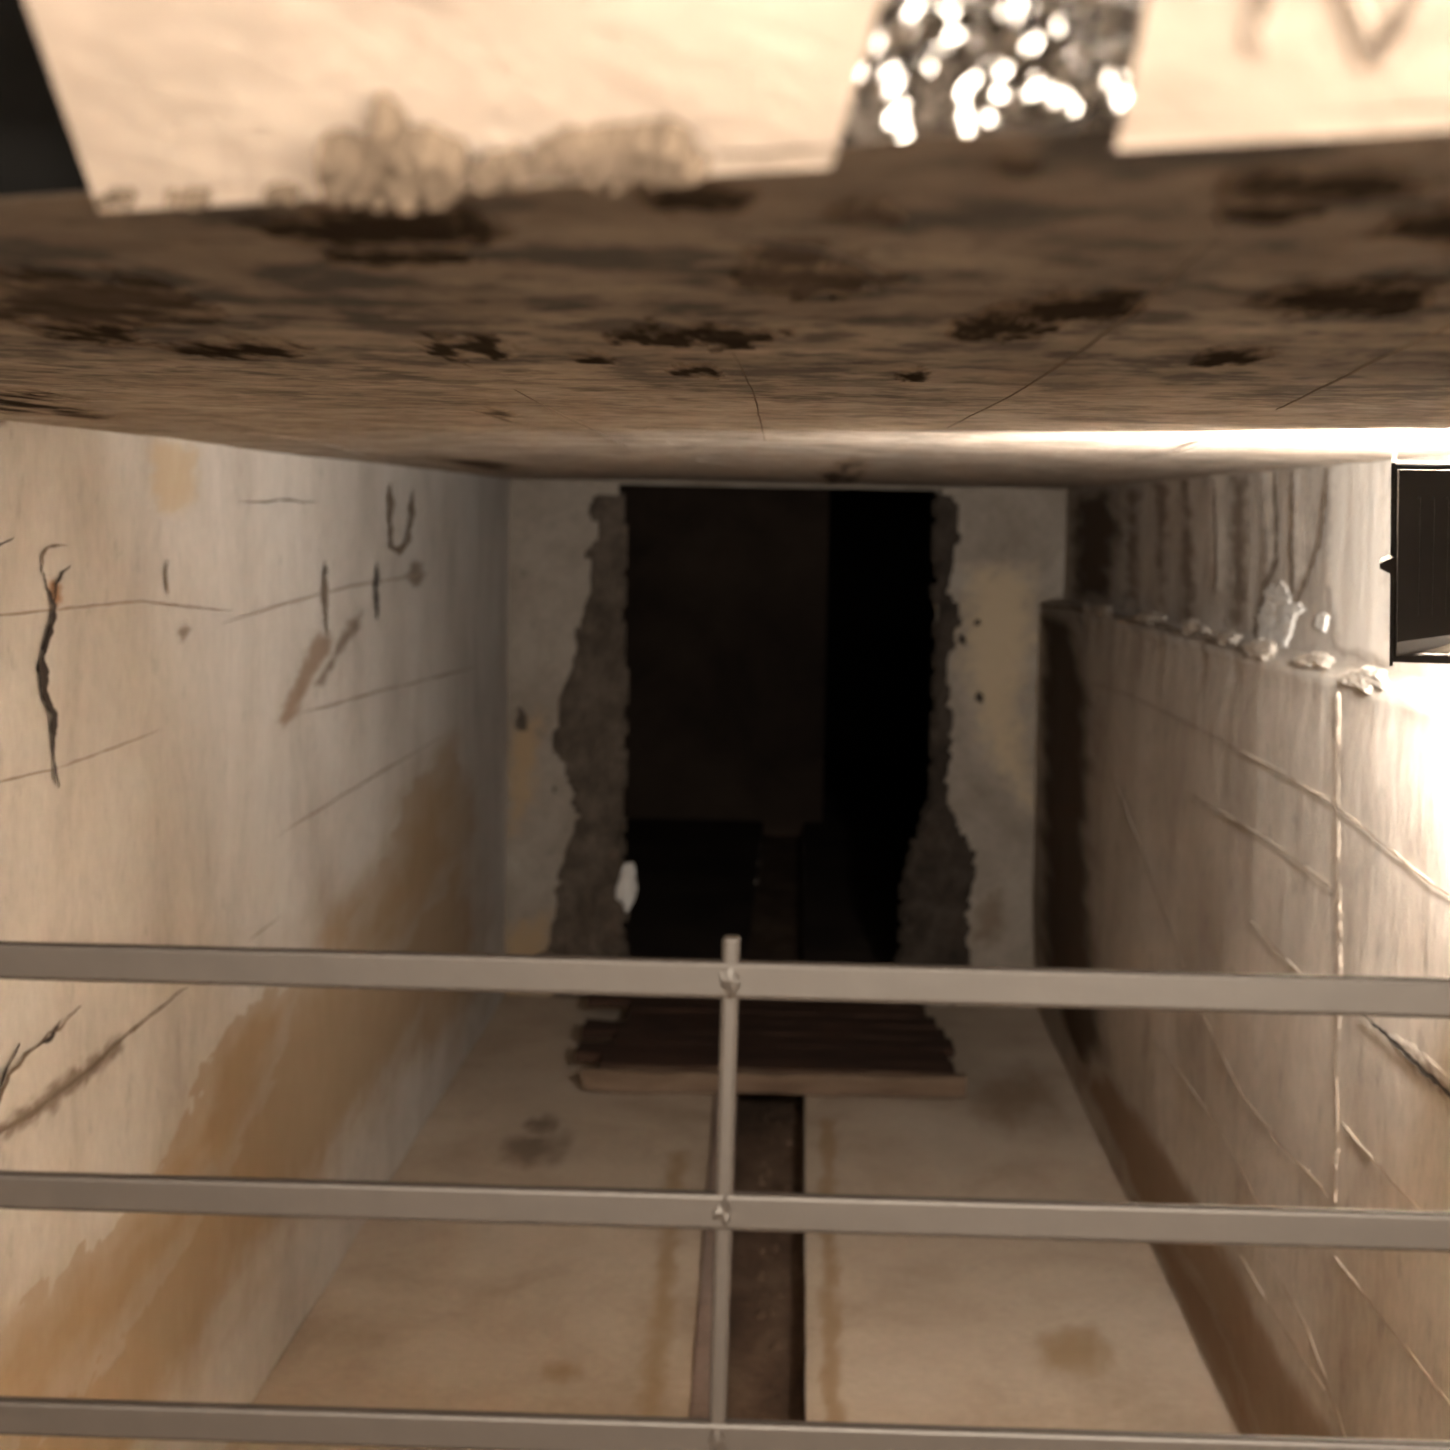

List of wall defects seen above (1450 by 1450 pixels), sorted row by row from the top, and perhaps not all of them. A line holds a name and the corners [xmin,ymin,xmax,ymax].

damp [318,206,501,270]
damp [1186,346,1285,368]
crack [0,537,70,787]
flaking render [515,707,528,731]
flaking render [537,493,629,957]
flaking render [894,488,981,966]
damp [250,696,558,955]
crack [0,986,187,1149]
damp [116,986,553,1180]
crack [1365,1016,1450,1111]
damp [0,1210,330,1403]
damp [0,1435,211,1450]